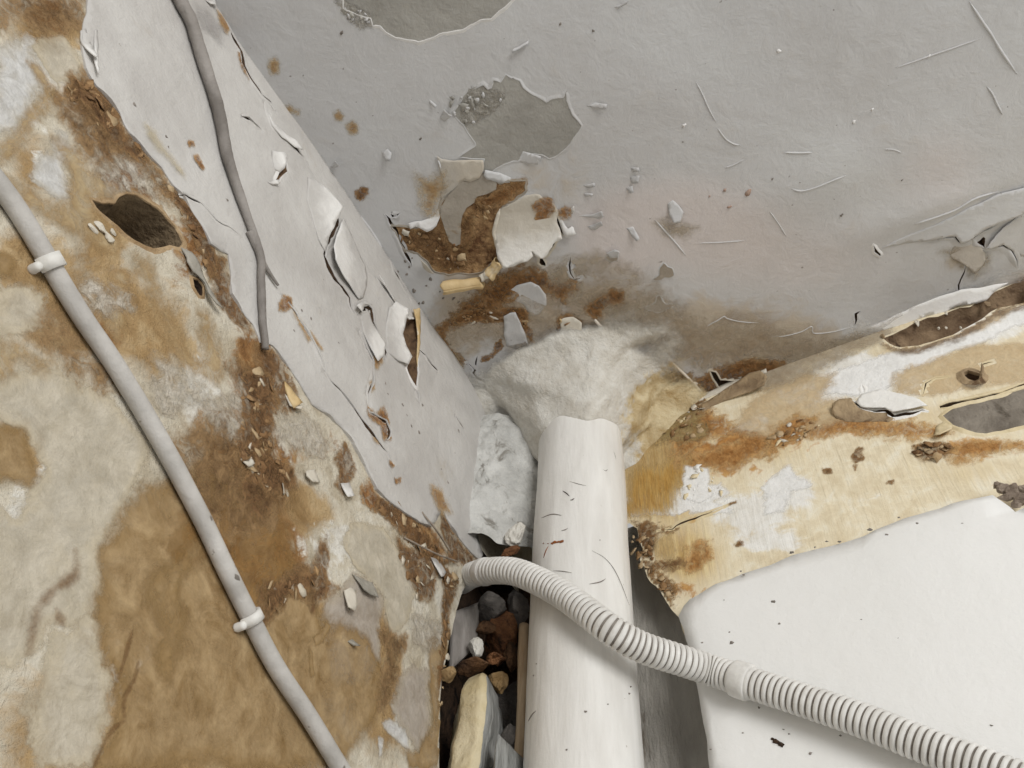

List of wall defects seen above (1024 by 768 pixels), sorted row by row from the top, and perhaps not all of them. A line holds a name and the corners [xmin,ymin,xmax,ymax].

water stain [1,63,177,251]
peeling [390,74,604,277]
peeling [306,177,421,367]
peeling [867,283,1007,330]
crack [939,219,1022,292]
water stain [150,310,382,757]
water stain [626,435,685,517]
peeling [832,389,928,422]
peeling [911,385,1024,463]
spalling [993,481,1024,508]
water stain [95,484,328,768]
water stain [406,614,448,768]